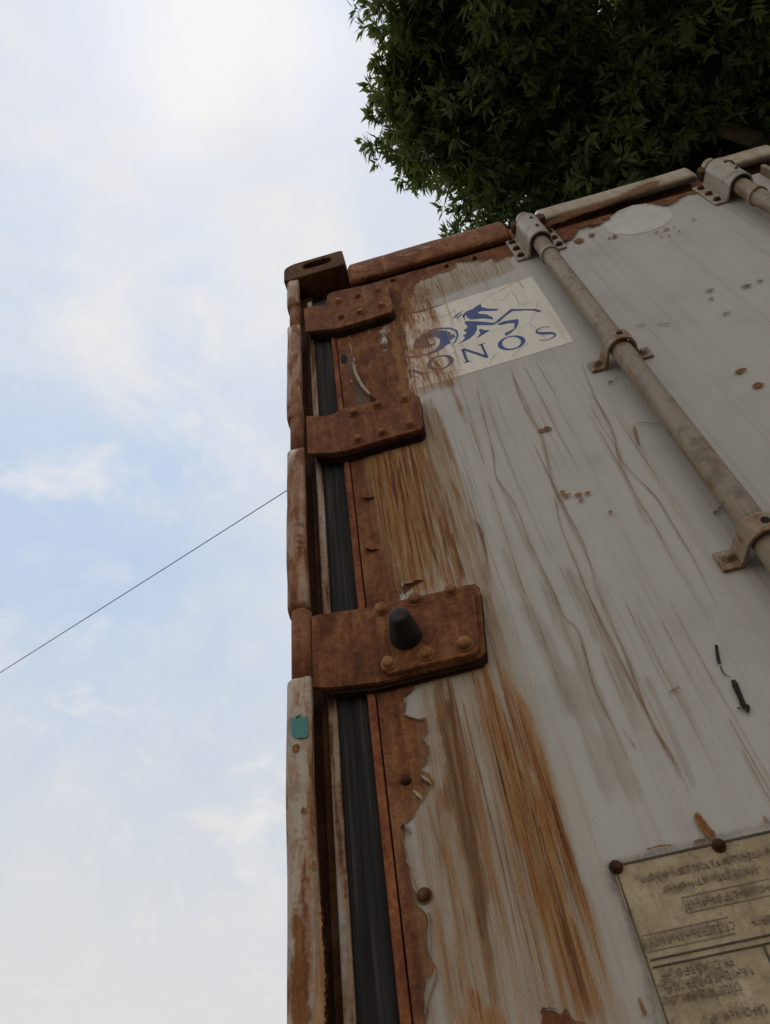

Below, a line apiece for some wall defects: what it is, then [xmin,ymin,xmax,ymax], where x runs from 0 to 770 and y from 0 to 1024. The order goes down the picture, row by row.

corrosion [379,270,463,413]
corrosion [366,405,617,1024]
peeling [377,685,437,1024]
corrosion [694,812,716,843]
corrosion [290,864,328,1024]